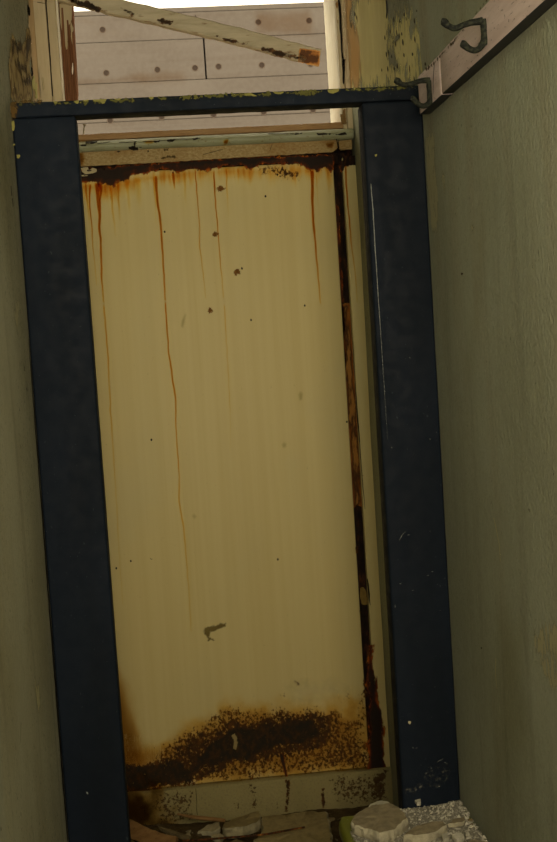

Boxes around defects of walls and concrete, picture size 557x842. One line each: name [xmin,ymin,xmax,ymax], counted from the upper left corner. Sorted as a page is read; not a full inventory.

spalling [8,0,44,106]
peeling [71,0,102,13]
peeling [149,0,464,101]
rust [81,154,362,508]
rust [121,645,386,812]